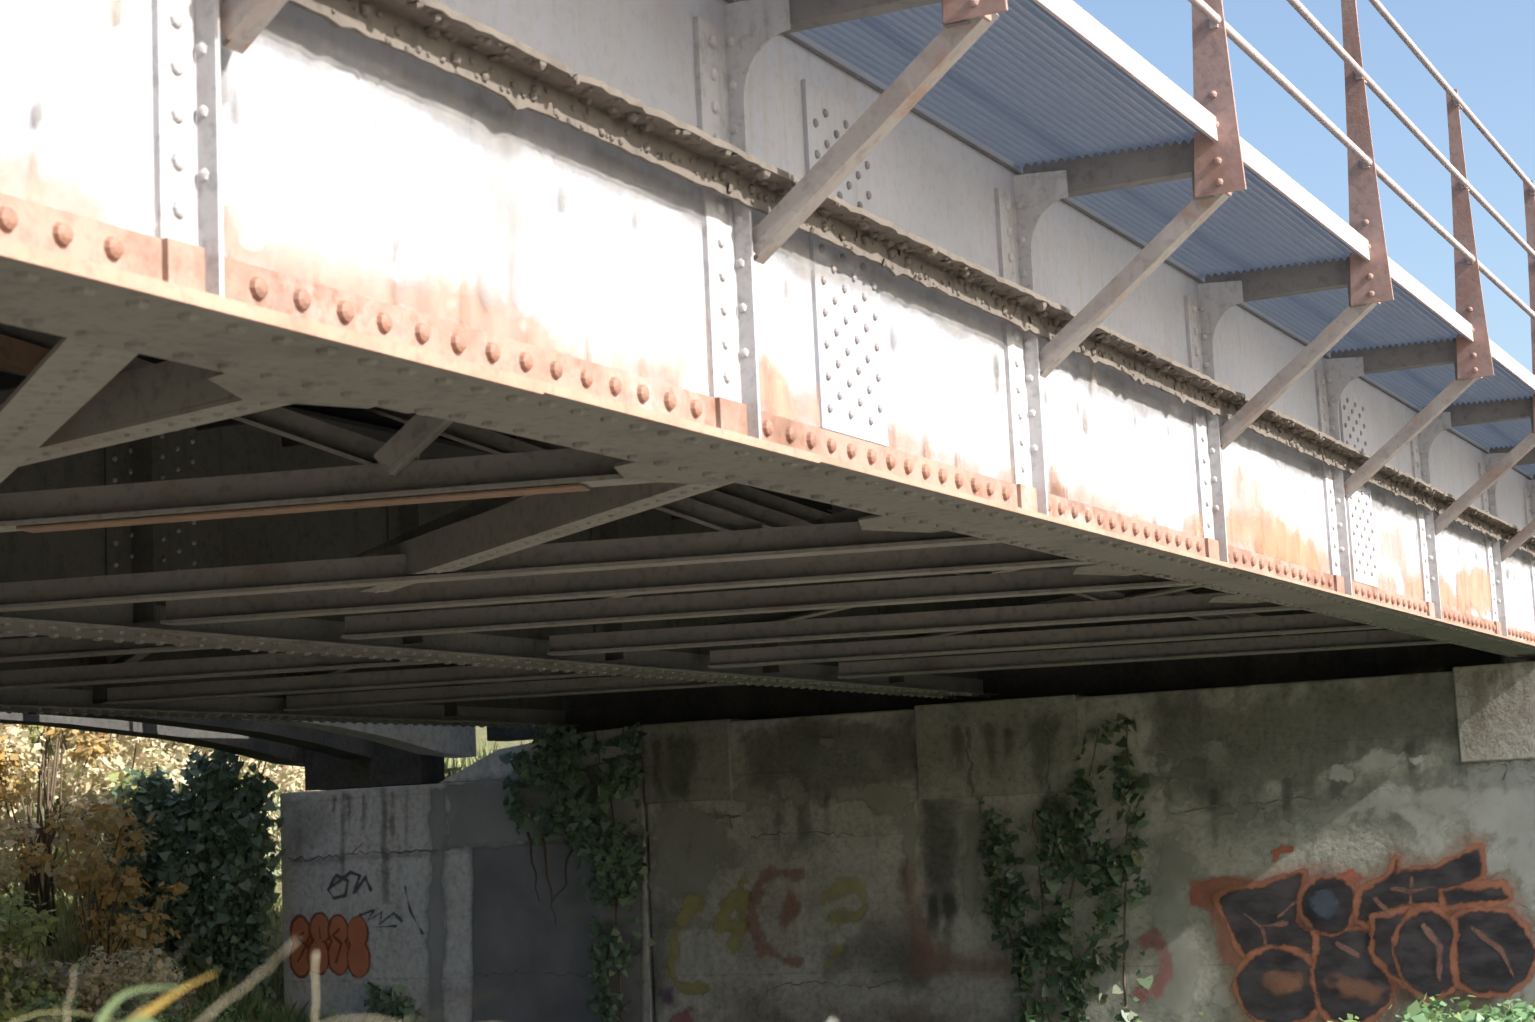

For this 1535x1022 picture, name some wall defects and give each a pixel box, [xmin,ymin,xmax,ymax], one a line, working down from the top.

rust [0,166,99,221]
rust [223,211,590,362]
rust [739,350,934,460]
rust [1186,514,1352,577]
rust [1378,566,1492,618]
crack [1456,759,1535,780]